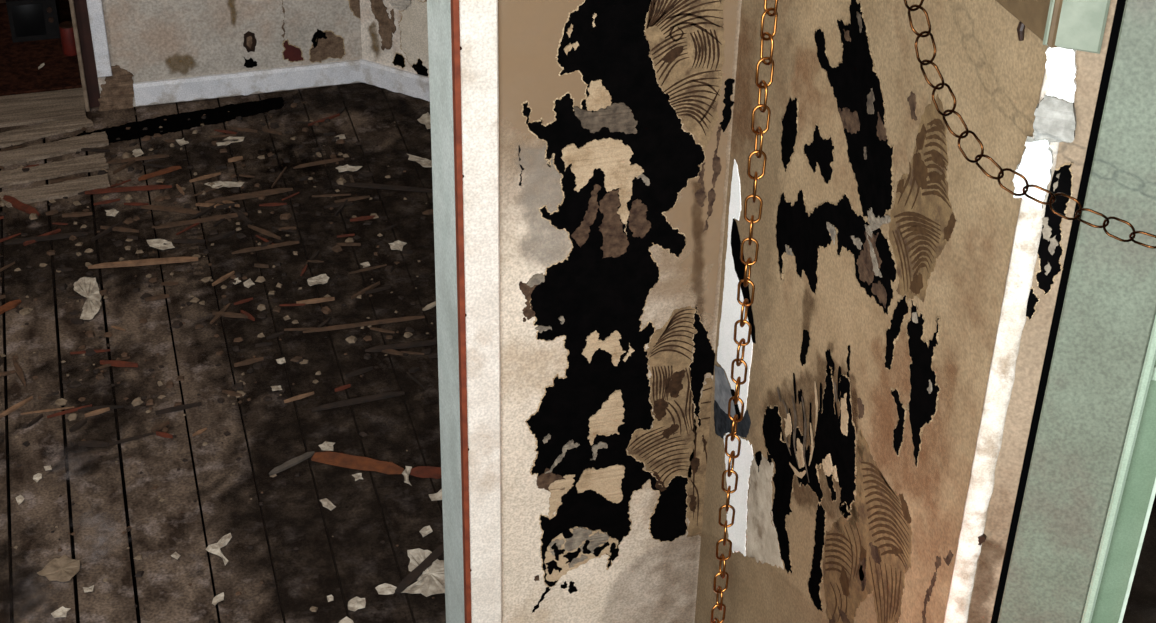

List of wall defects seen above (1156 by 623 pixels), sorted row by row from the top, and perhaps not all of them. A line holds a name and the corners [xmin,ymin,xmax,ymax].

damp [228,0,236,24]
flaking render [392,52,428,77]
peeling [561,80,651,258]
peeling [1013,46,1077,276]
peeling [851,207,891,308]
peeling [519,273,565,333]
peeling [582,330,635,366]
flaking render [714,159,784,570]
peeling [840,393,849,436]
peeling [536,390,625,518]
peeling [822,453,839,482]
peeling [544,526,619,582]